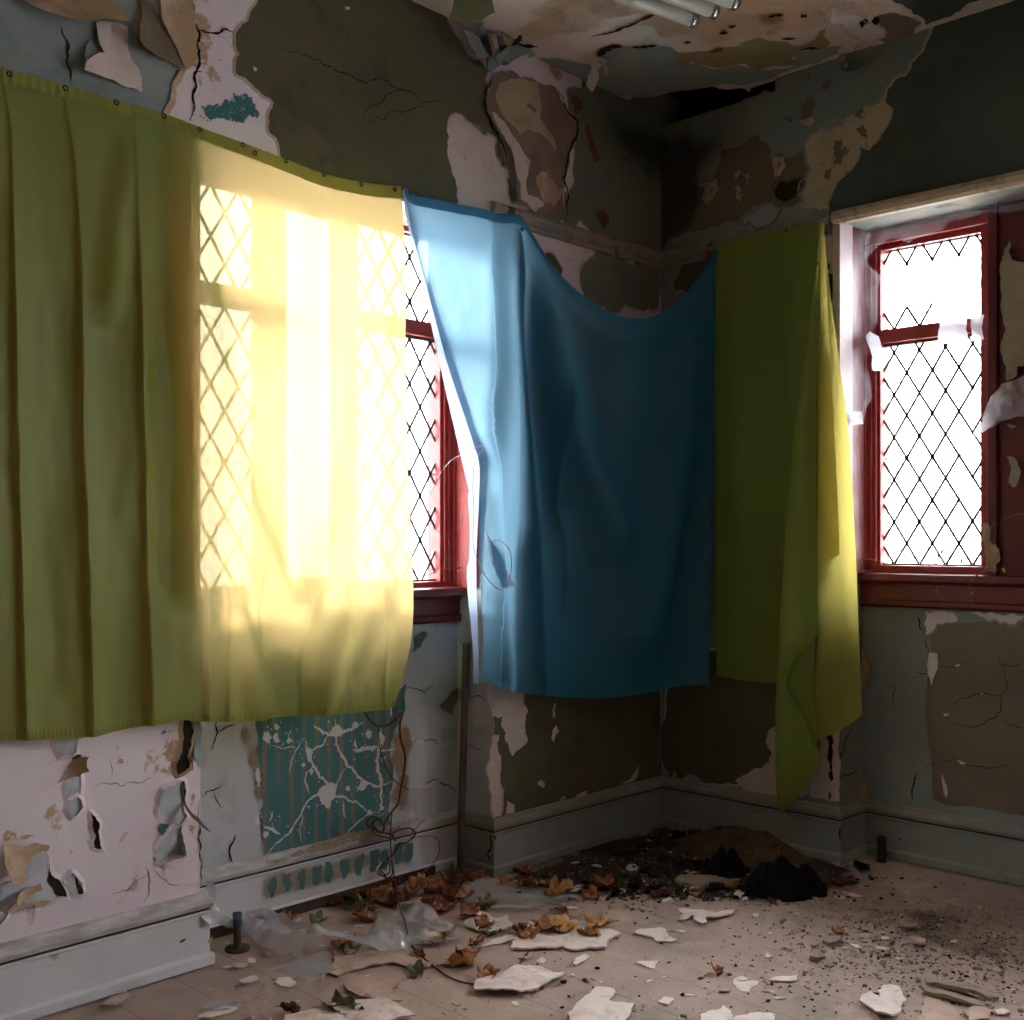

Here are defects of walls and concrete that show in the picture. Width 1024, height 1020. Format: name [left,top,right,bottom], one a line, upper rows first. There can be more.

peeling [0,0,198,115]
crack [190,4,234,120]
crack [269,41,451,125]
flaking render [232,0,1024,246]
peeling [922,609,1024,637]
peeling [0,843,87,929]
peeling [49,738,106,853]
crack [96,757,153,787]
crack [112,784,223,901]
peeling [152,720,210,866]
flaking render [494,648,776,816]
crack [941,652,1024,728]